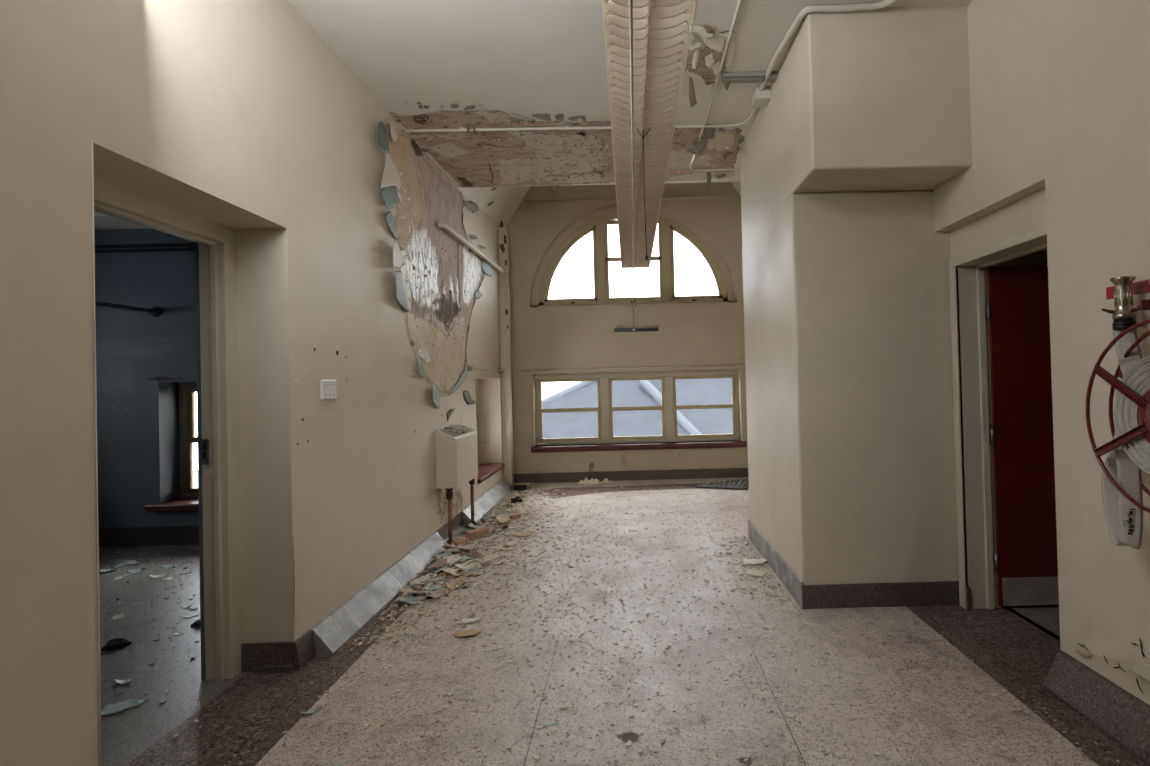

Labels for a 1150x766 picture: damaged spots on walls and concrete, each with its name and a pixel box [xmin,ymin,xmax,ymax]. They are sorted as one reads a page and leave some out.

peeling [675,23,737,108]
peeling [665,127,744,189]
peeling [377,101,615,422]